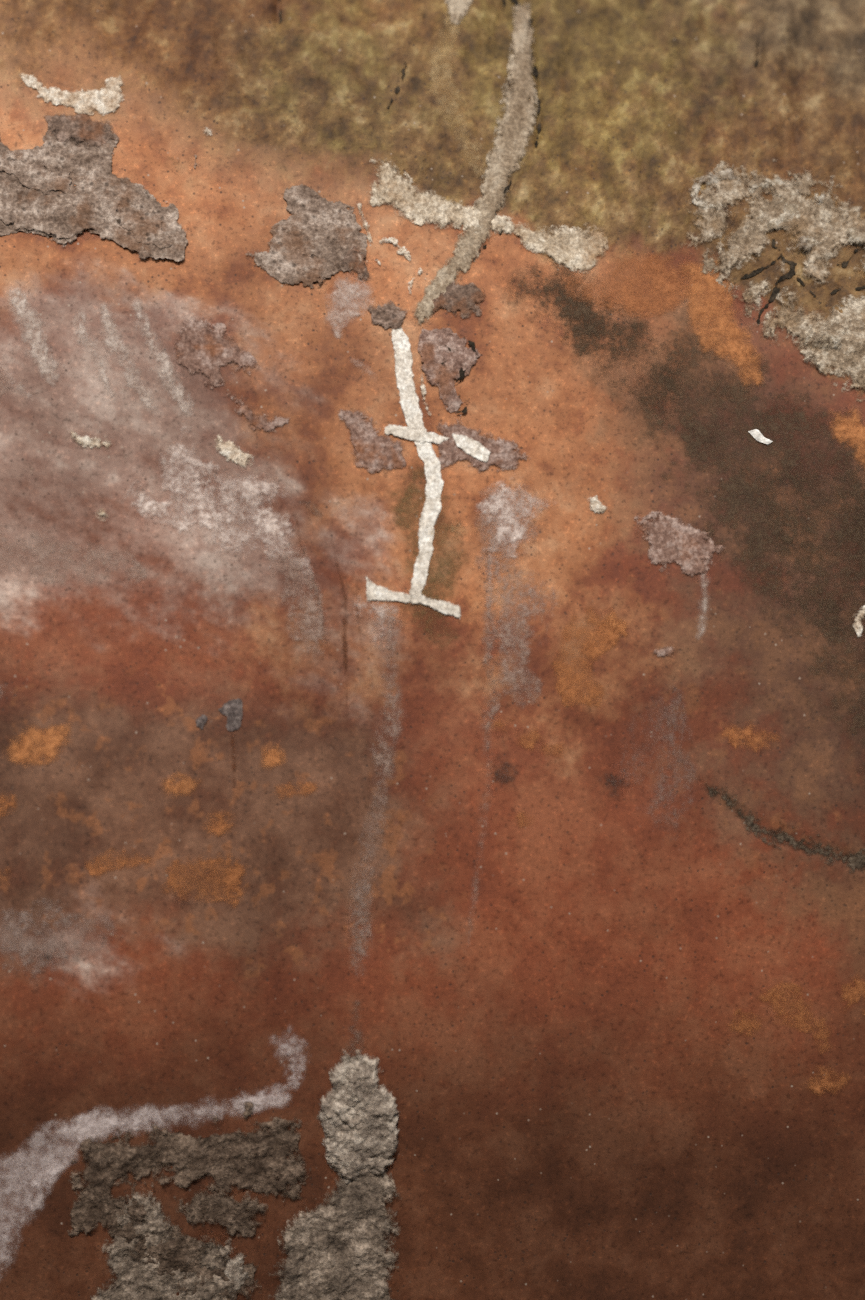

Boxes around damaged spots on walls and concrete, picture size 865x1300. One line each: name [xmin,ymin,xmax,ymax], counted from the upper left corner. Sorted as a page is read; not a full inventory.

flaking render [0,114,188,262]
water stain [10,288,56,379]
flaking render [418,278,527,471]
spalling [687,161,865,401]
efflorescence [132,444,323,643]
rust [10,725,69,764]
rust [168,858,244,904]
rust [264,749,284,766]
crack [707,786,865,873]
efflorescence [197,1045,303,1114]
efflorescence [0,1107,177,1260]
spalling [67,1101,399,1300]